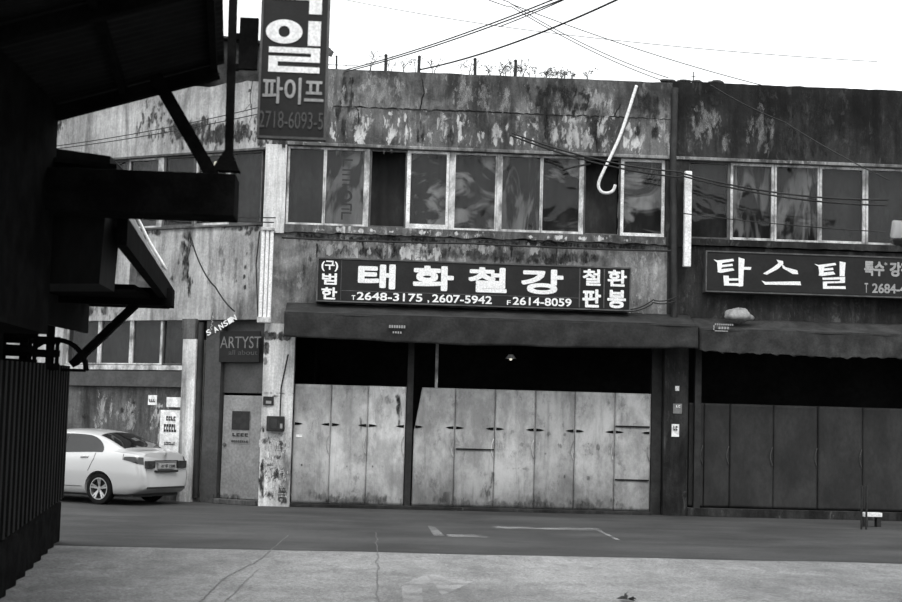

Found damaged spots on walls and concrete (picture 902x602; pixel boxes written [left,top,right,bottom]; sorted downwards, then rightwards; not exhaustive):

damp [336,77,354,135]
peeling [354,118,369,144]
peeling [384,111,412,146]
peeling [424,115,463,144]
peeling [477,123,534,148]
damp [527,85,598,149]
damp [181,232,191,297]